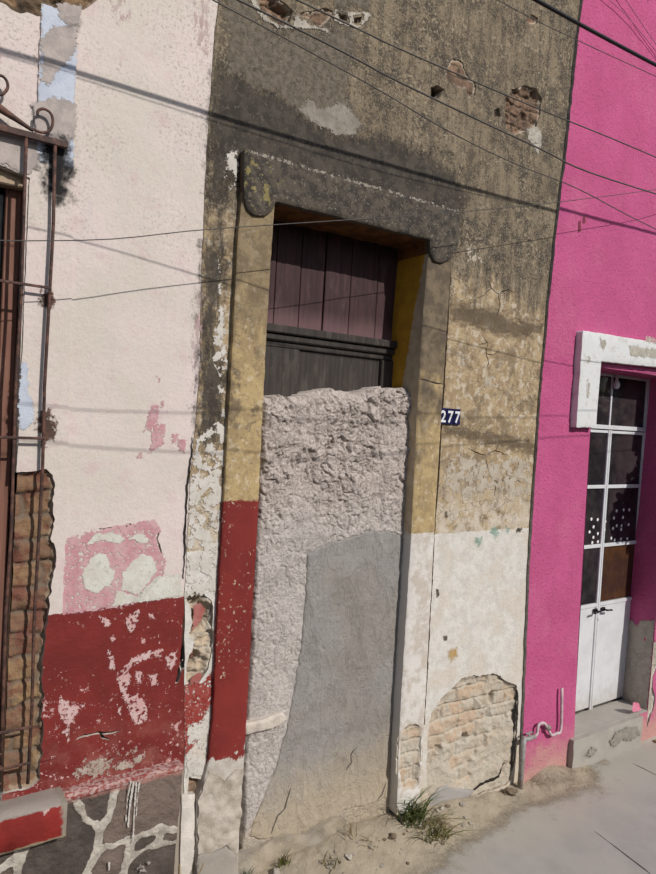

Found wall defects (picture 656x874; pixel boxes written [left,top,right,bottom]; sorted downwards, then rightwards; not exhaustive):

peeling [251,0,371,33]
peeling [0,0,97,174]
peeling [224,151,239,191]
flaking render [445,59,475,98]
spalling [494,86,542,154]
peeling [211,284,229,393]
flaking render [3,401,244,855]
spalling [621,618,656,721]
flaking render [396,673,518,798]
peeling [610,726,641,748]